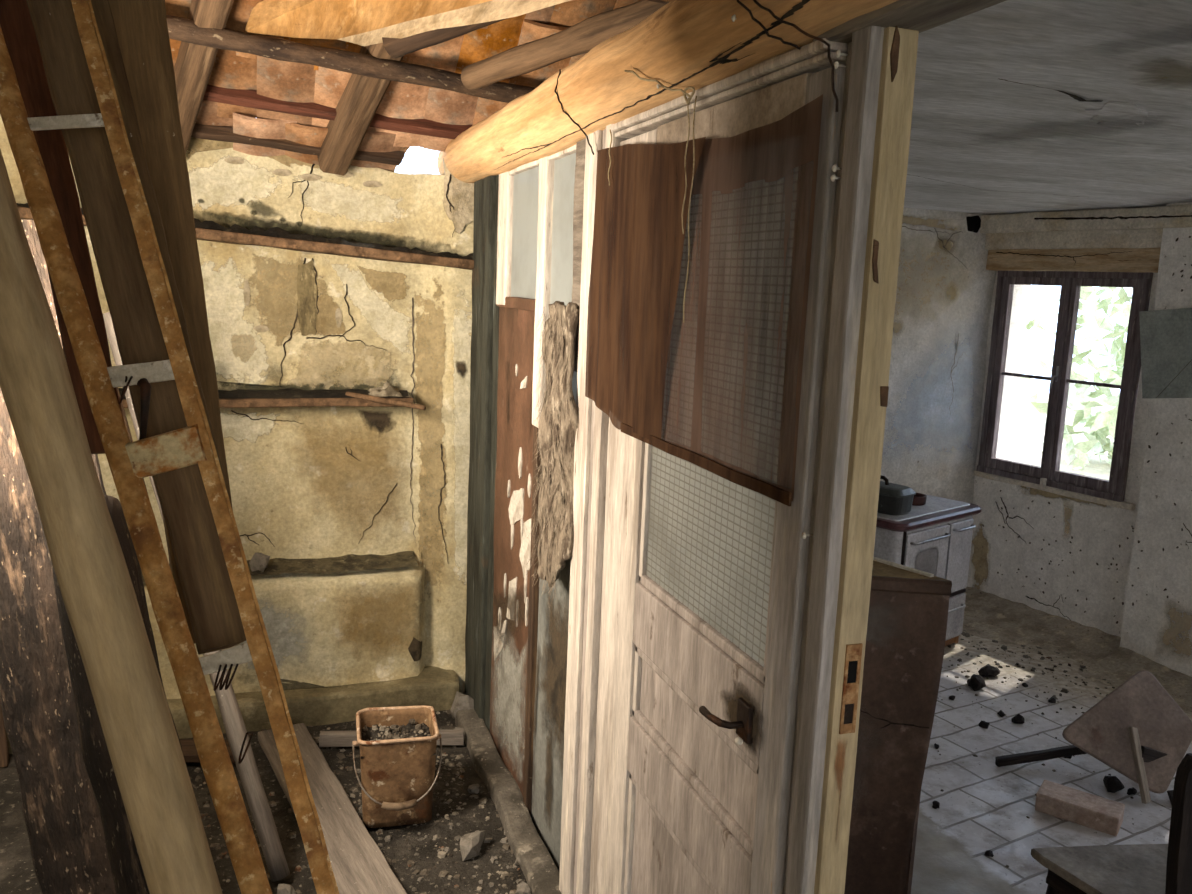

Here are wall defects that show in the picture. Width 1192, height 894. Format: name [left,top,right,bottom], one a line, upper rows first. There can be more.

crack [1000,79,1102,102]
flaking render [185,137,245,164]
flaking render [267,155,321,181]
flaking render [335,172,382,187]
flaking render [443,158,474,234]
crack [279,258,448,562]
crack [995,497,1034,540]
peeling [494,447,531,660]
flaking render [972,524,1082,594]